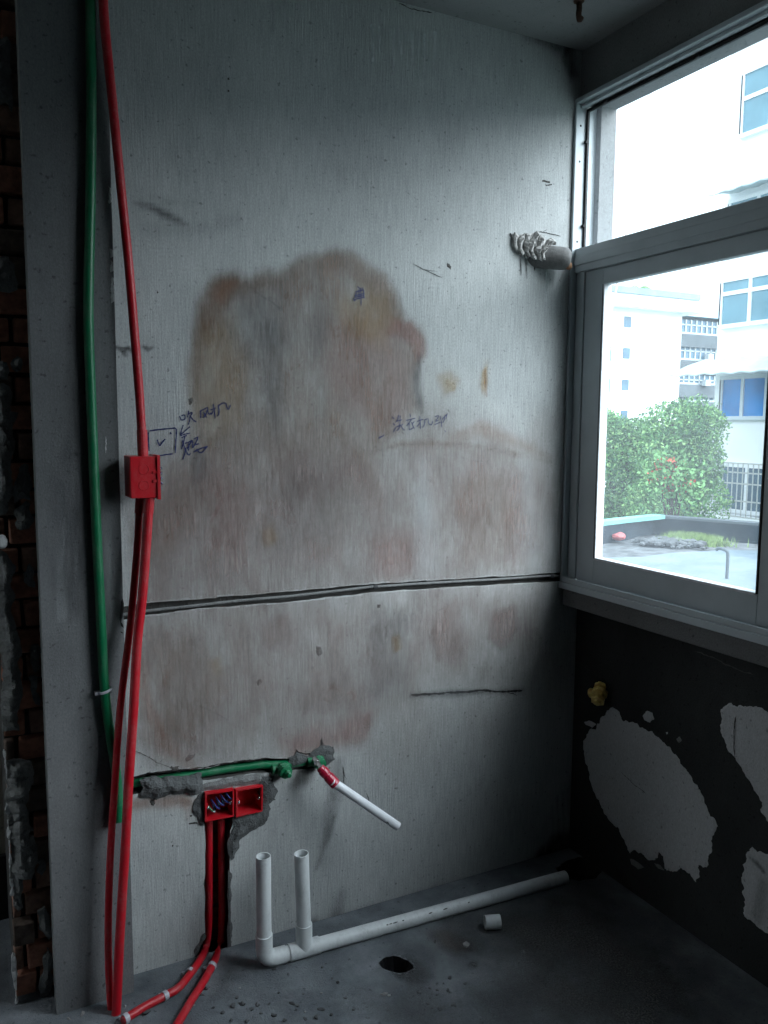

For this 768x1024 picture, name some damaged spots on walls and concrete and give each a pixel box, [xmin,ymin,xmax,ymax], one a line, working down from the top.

spalling [0,0,54,1005]
water stain [154,252,434,582]
crack [411,689,522,697]
peeling [583,707,718,882]
peeling [720,703,768,821]
peeling [741,847,768,933]